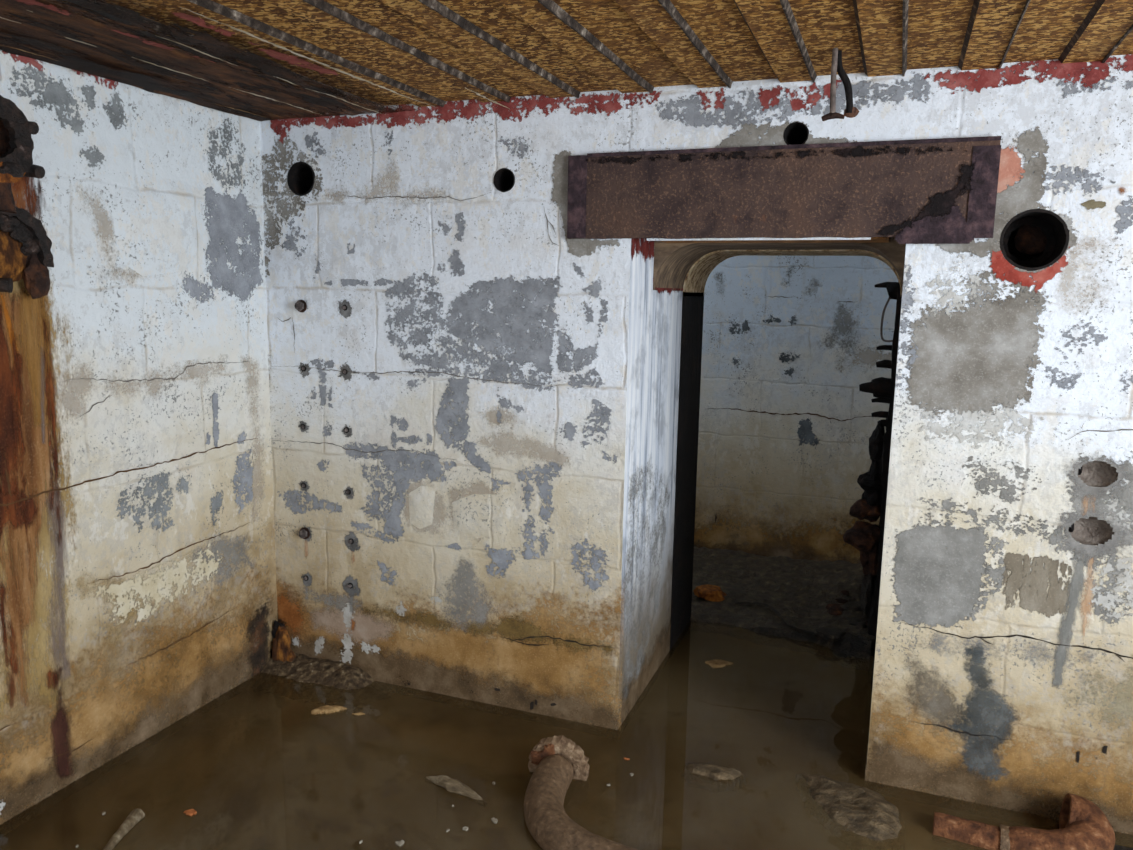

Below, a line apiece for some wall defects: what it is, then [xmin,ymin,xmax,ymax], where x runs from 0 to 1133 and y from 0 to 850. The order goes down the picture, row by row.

rust [586,146,976,240]
peeling [0,0,1133,629]
rust [0,162,76,778]
crack [0,437,455,506]
damp [0,468,671,825]
damp [865,639,1133,835]
crack [902,622,1133,661]